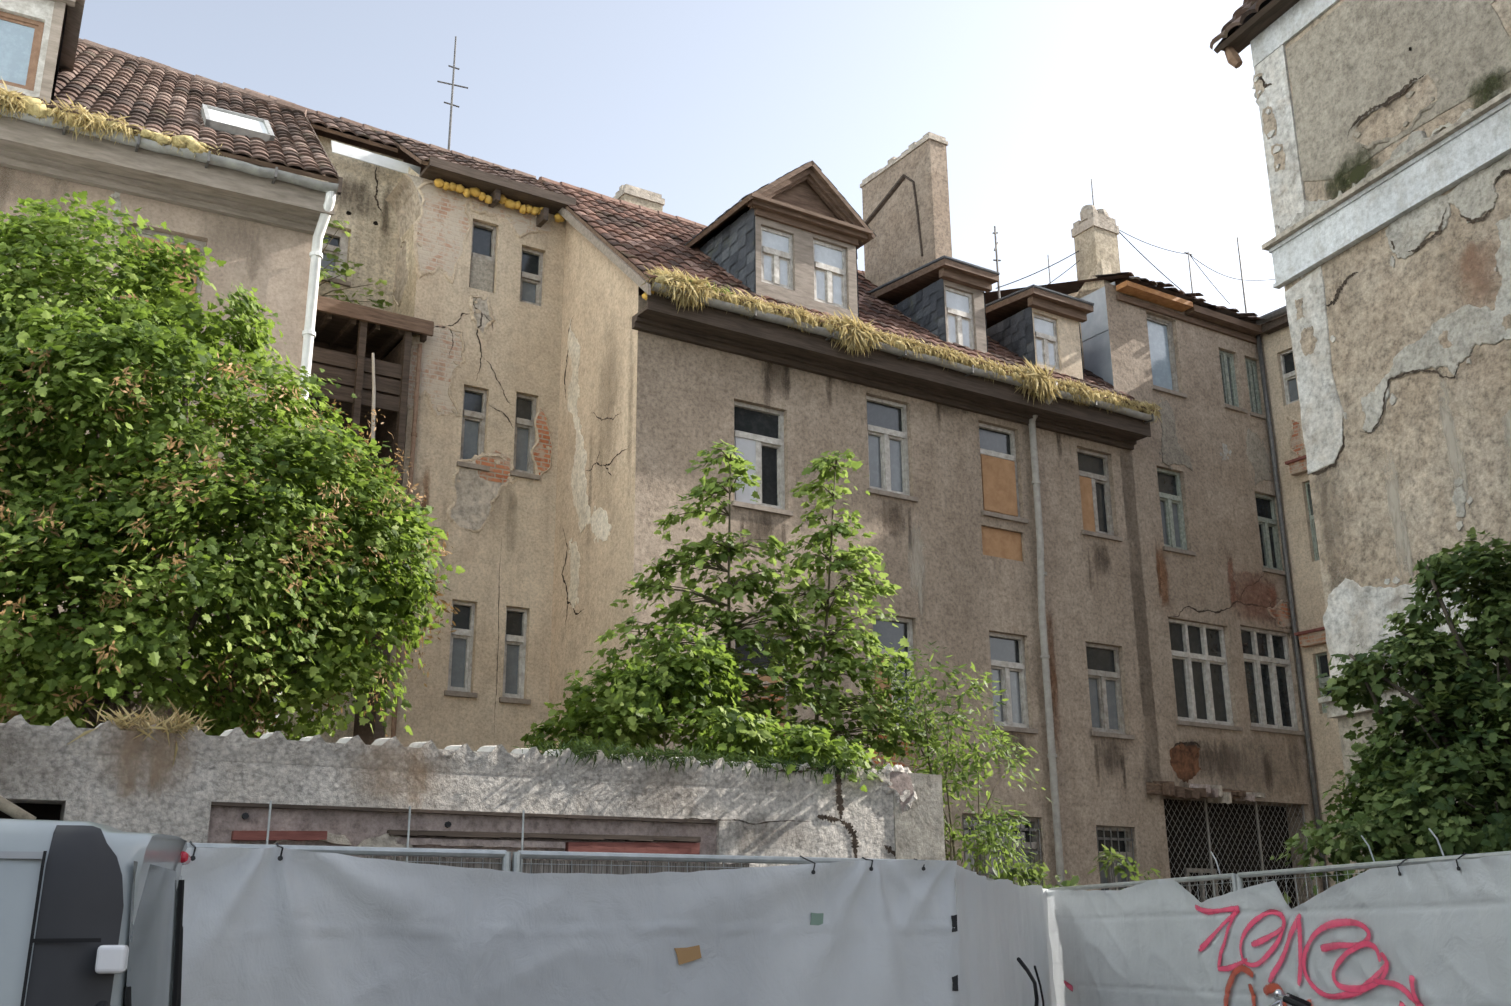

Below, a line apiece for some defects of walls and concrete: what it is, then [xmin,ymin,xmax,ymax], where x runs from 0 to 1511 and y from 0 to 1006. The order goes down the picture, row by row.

peeling [1252,0,1511,236]
peeling [392,180,554,307]
peeling [407,294,495,419]
crack [435,298,513,427]
peeling [1284,153,1511,474]
spalling [446,407,553,533]
peeling [567,319,612,609]
peeling [1323,576,1482,678]
crack [684,767,895,858]
spalling [1169,741,1201,783]